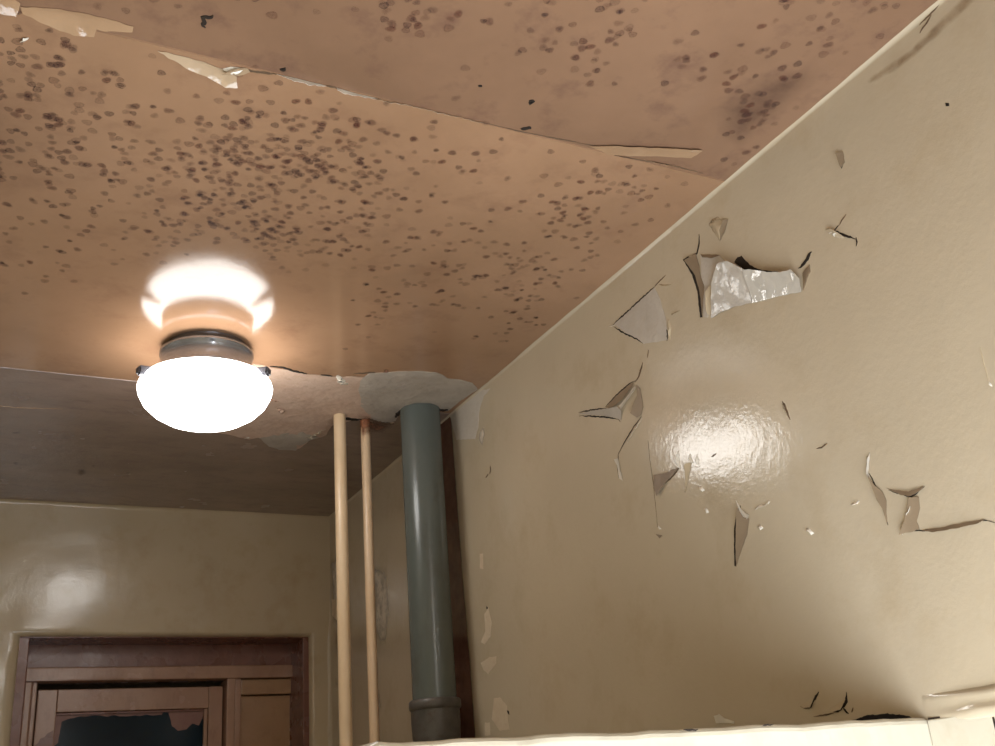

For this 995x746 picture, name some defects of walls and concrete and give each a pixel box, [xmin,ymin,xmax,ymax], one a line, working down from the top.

peeling [0,0,133,37]
peeling [158,51,702,173]
peeling [826,215,858,246]
peeling [683,236,812,318]
peeling [580,276,680,421]
flaking render [214,364,490,451]
peeling [653,452,699,496]
peeling [734,501,770,566]
peeling [866,452,995,535]